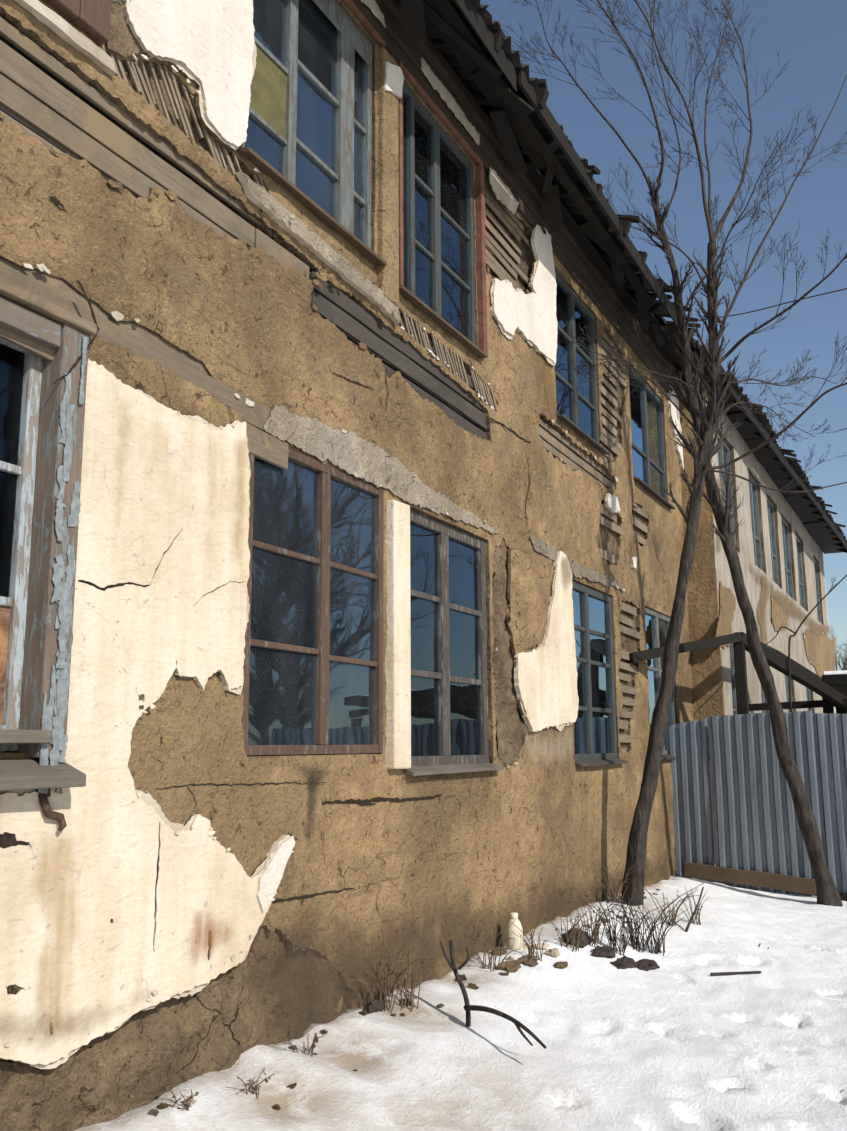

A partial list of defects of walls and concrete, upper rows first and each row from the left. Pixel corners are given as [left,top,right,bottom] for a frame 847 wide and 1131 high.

peeling [0,0,498,440]
flaking render [539,331,648,565]
crack [78,534,178,591]
peeling [39,335,254,766]
flaking render [0,832,33,849]
crack [152,836,160,938]
peeling [128,672,315,913]
crack [156,782,442,806]
crack [272,888,354,903]
spalling [0,927,347,1131]